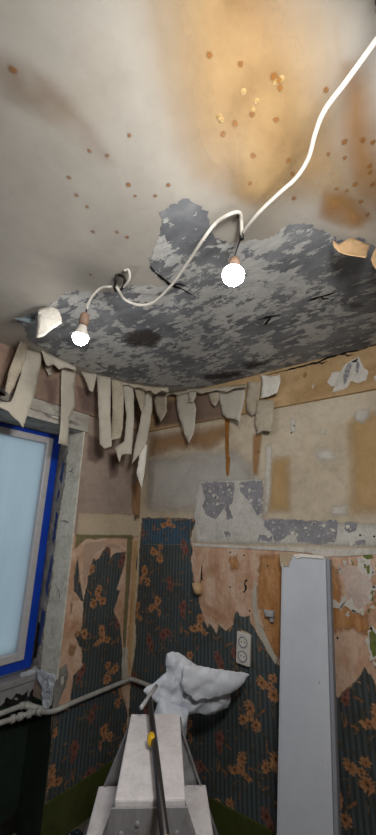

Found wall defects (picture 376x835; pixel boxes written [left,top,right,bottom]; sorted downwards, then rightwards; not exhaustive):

leakage [174,0,343,200]
peeling [15,199,376,392]
flaking render [50,534,138,735]
flaking render [191,480,376,698]